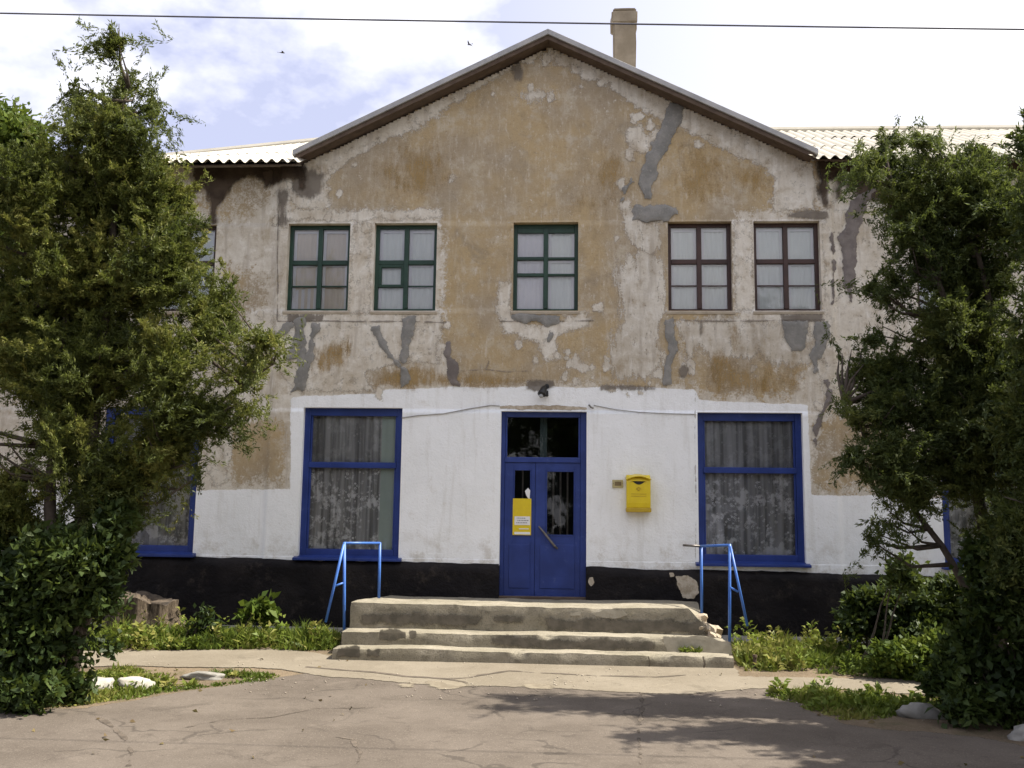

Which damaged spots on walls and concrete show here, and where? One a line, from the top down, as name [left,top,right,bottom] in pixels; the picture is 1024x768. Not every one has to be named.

water stain [192,164,323,225]
peeling [256,48,672,400]
peeling [674,109,897,420]
flaking render [669,573,699,599]